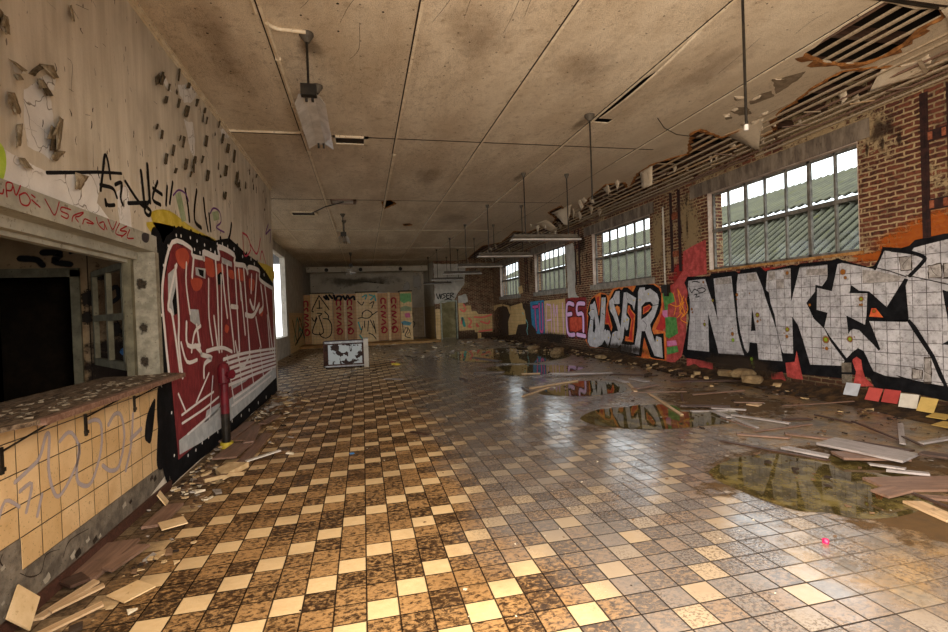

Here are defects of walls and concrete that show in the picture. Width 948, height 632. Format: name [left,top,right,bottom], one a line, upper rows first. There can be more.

peeling [0,9,11,35]
peeling [723,71,806,126]
peeling [0,58,132,227]
peeling [155,68,264,199]
peeling [495,300,547,341]